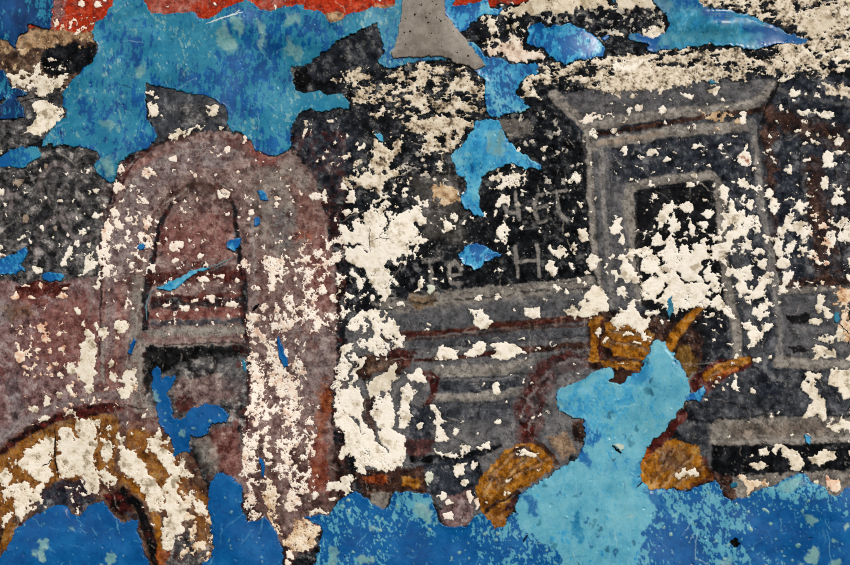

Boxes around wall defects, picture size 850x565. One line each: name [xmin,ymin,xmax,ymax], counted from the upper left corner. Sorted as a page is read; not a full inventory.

flaking render [1,0,106,137]
peeling [0,61,569,565]
crack [43,429,59,478]
peeling [675,467,699,480]
peeling [730,442,841,497]